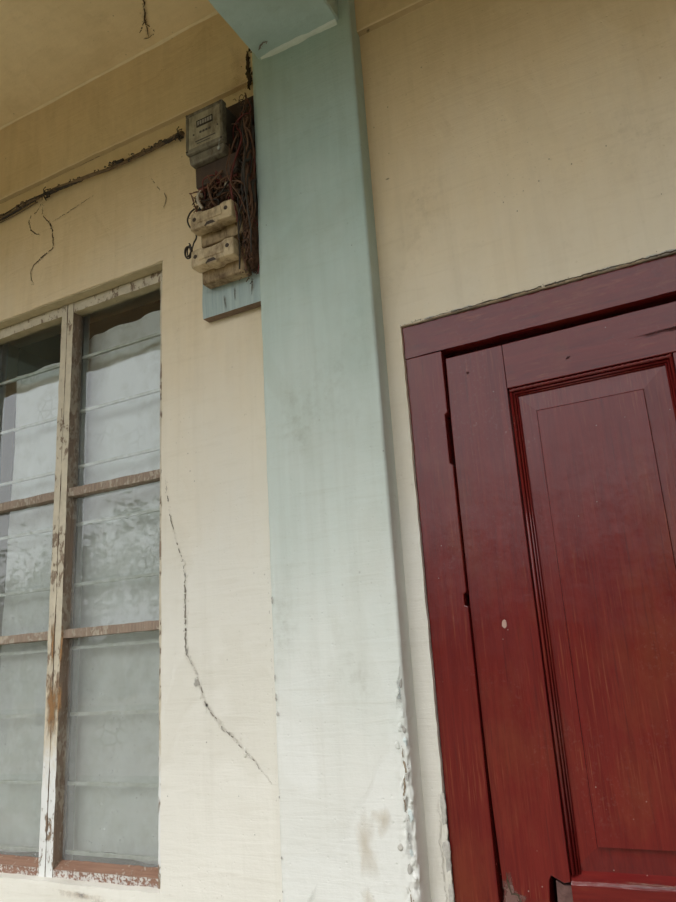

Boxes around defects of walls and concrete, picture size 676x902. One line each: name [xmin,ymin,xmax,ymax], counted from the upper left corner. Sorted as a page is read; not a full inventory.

crack [139,0,154,39]
crack [28,181,94,285]
crack [165,486,280,801]
spalling [395,711,418,902]